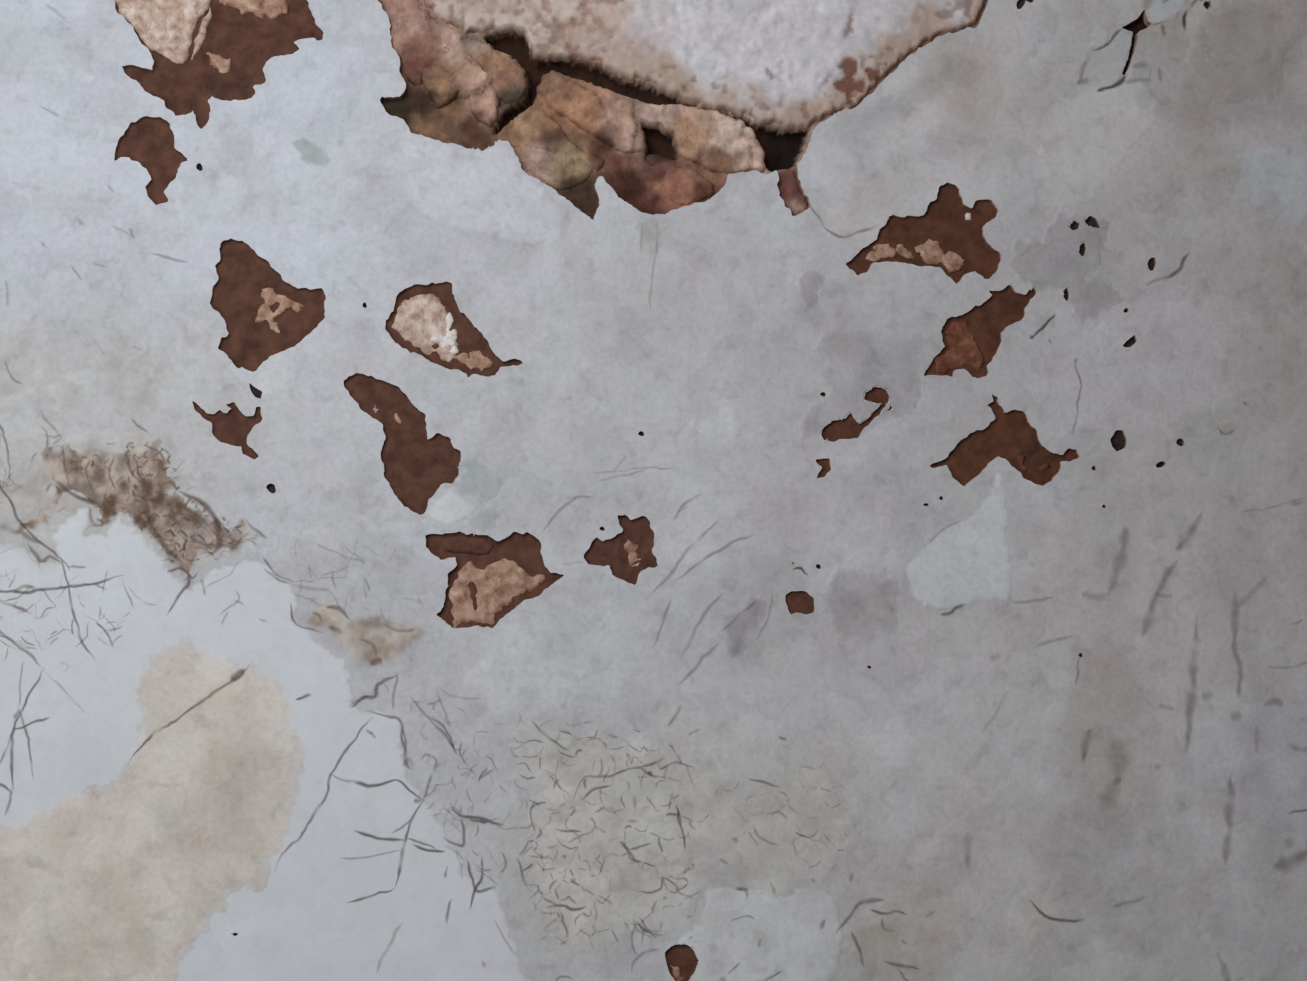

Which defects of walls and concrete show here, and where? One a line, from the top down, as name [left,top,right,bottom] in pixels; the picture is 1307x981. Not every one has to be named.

leakage [0,315,273,580]
flaking render [115,0,323,205]
flaking render [193,239,326,459]
flaking render [385,282,522,377]
flaking render [344,373,564,628]
peeling [381,140,563,245]
flaking render [584,515,657,585]
flaking render [846,183,1035,378]
peeling [906,396,1078,615]
crack [1081,0,1187,91]
leakage [0,636,306,981]
peeling [0,508,530,981]